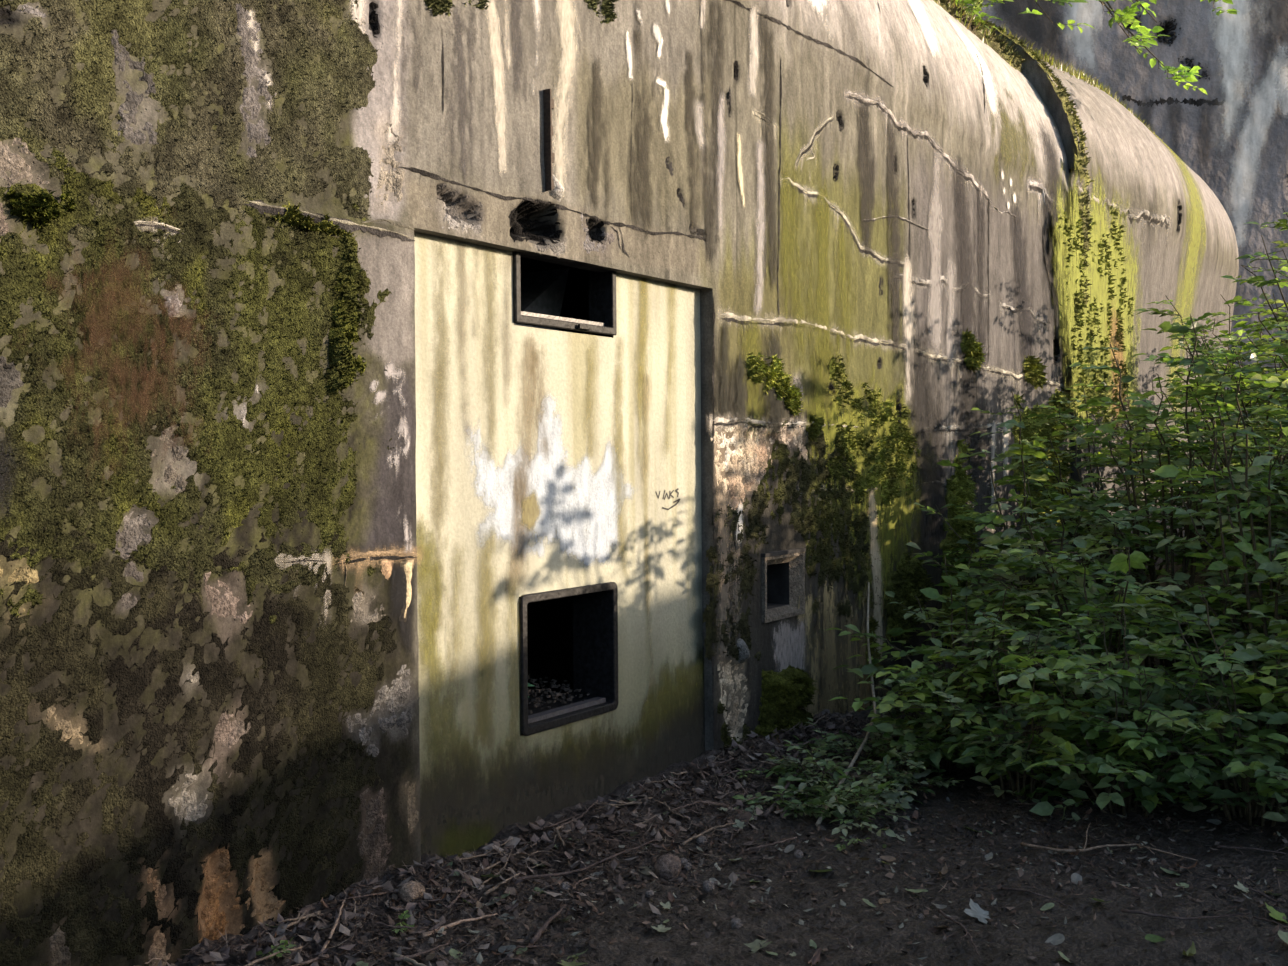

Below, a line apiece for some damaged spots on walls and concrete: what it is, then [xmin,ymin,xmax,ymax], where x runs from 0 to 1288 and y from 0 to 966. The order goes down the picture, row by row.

spalling [235,3,277,158]
spalling [508,199,566,258]
leakage [626,9,663,78]
leakage [630,79,669,236]
leakage [686,0,854,442]
leakage [1043,129,1064,296]
leakage [1214,0,1288,245]
leakage [858,102,1009,541]
crack [712,0,1170,736]
peeling [711,424,808,510]
peeling [346,664,420,757]
peeling [717,655,748,741]